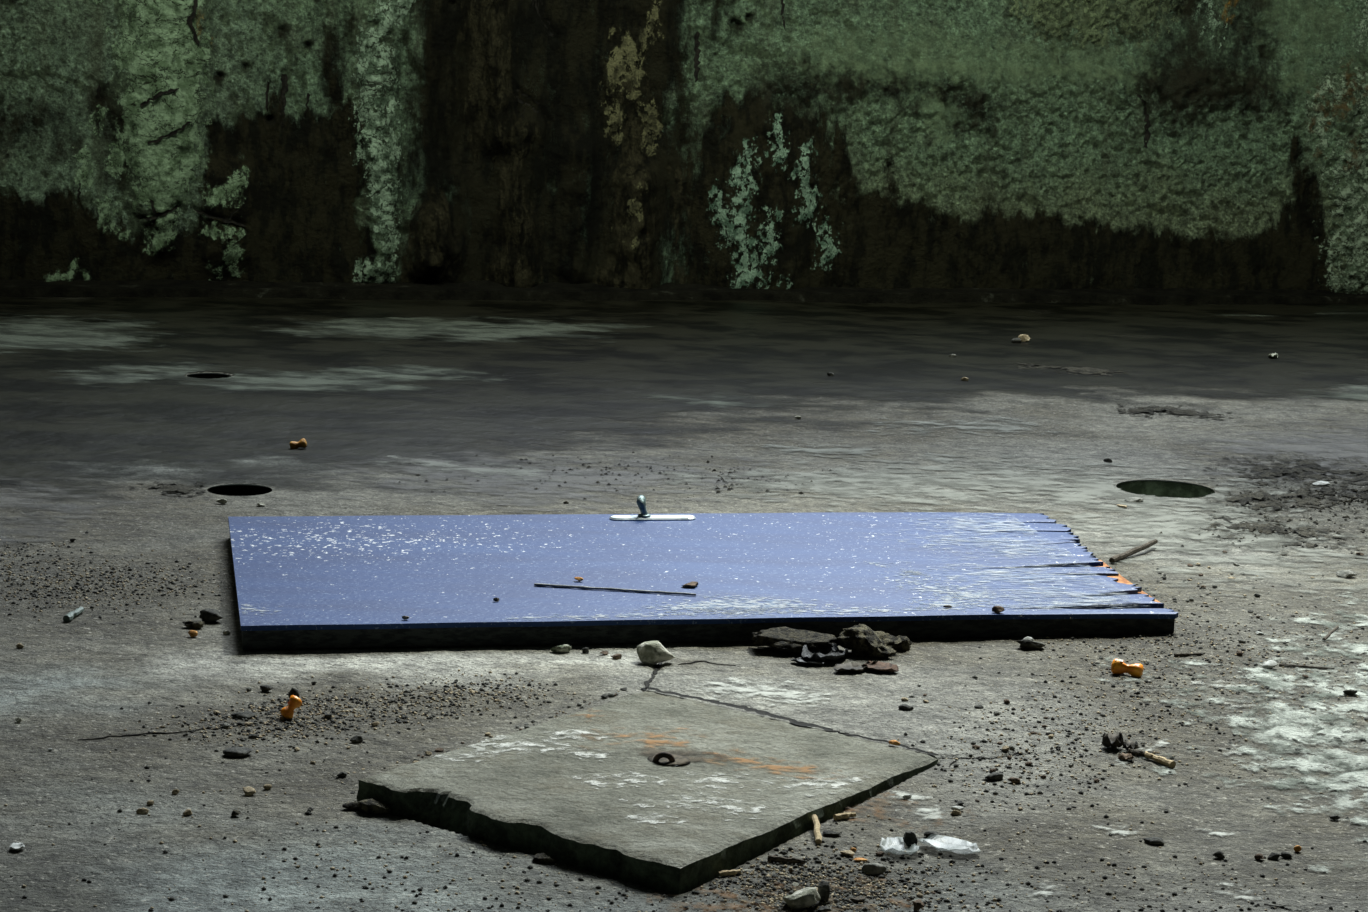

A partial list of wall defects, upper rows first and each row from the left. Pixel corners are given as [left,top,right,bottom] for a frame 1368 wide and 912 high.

crack [187,0,200,44]
crack [641,661,1032,767]